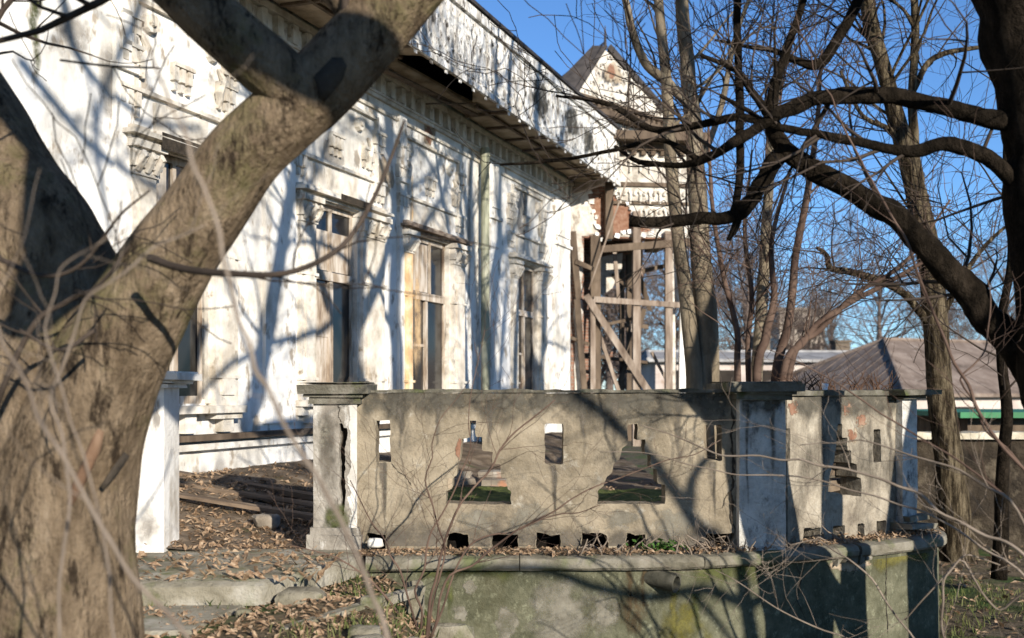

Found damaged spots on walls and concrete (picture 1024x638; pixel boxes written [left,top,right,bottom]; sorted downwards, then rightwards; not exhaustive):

flaking render [586,186,656,241]
crack [338,405,351,512]
leakage [665,590,700,638]